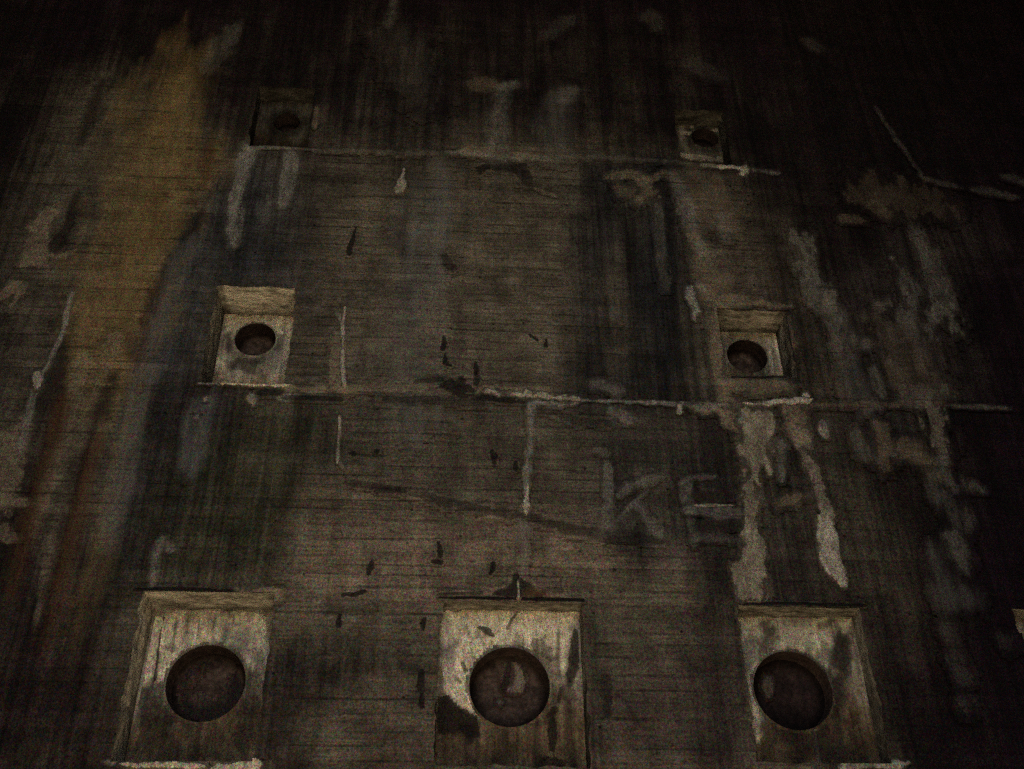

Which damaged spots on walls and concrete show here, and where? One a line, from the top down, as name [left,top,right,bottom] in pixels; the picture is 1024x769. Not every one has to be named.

corrosion [39,7,233,456]
leakage [86,80,1014,622]
corrosion [56,533,121,683]